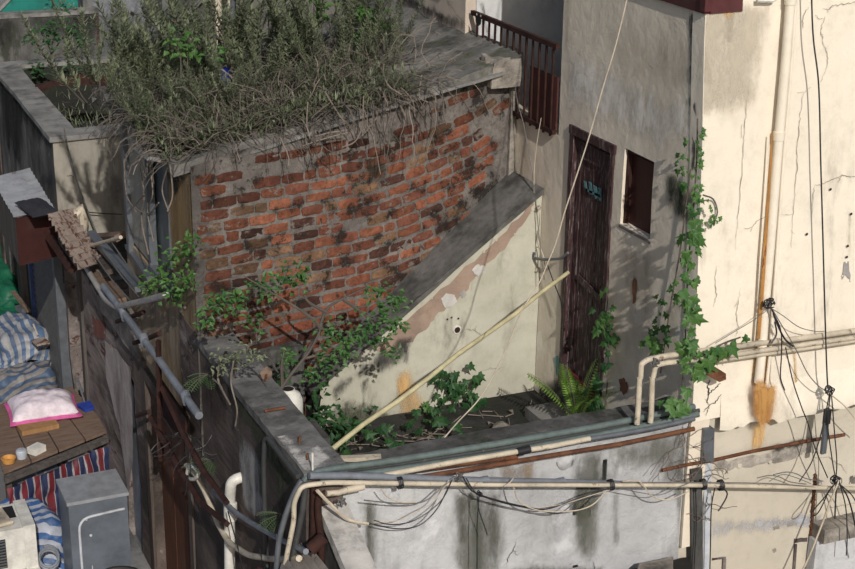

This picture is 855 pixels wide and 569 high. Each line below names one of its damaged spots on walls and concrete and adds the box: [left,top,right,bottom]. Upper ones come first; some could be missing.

damp [573,11,757,170]
crack [736,2,855,248]
peeling [376,203,534,354]
spalling [842,245,851,282]
crack [704,380,721,415]
damp [460,494,497,569]